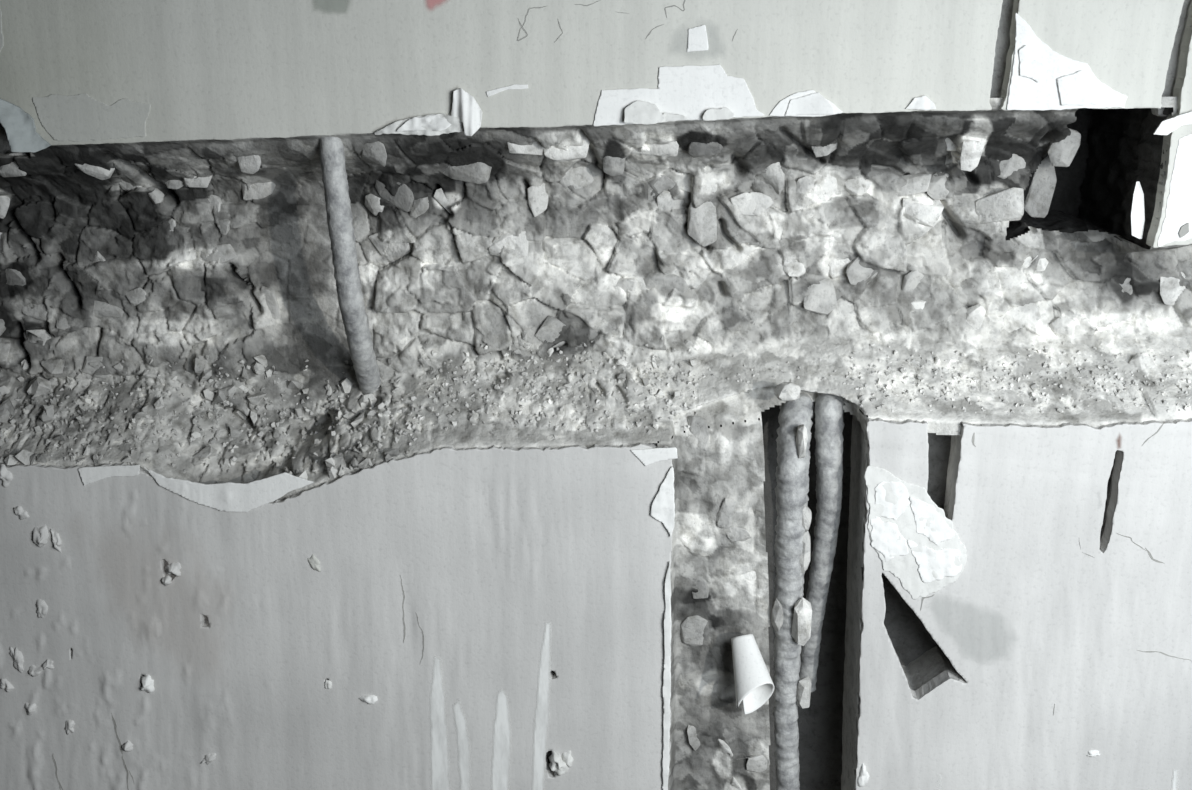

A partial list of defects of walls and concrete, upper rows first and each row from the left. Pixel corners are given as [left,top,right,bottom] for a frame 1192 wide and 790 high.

spalling [0,13,1192,512]
spalling [631,416,774,790]
peeling [863,454,967,691]
crack [1119,534,1165,564]
damp [430,657,470,790]
damp [492,690,510,790]
damp [532,623,550,790]